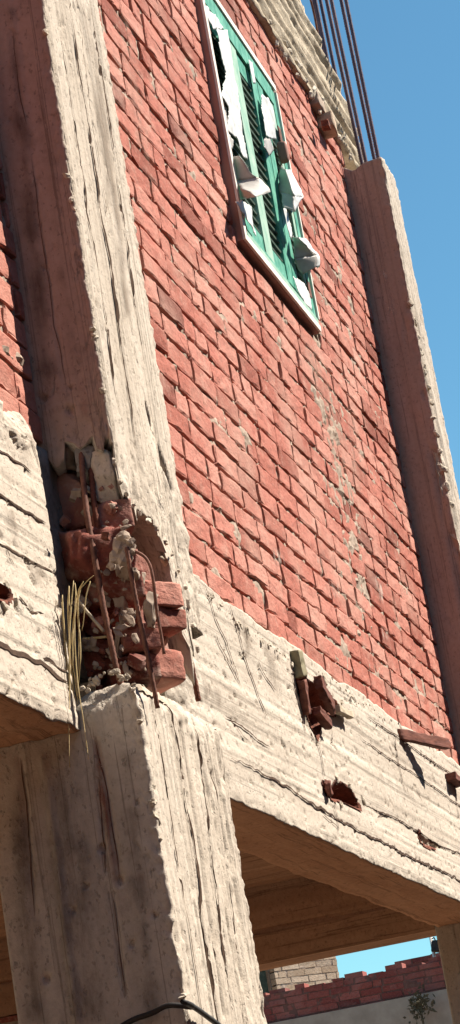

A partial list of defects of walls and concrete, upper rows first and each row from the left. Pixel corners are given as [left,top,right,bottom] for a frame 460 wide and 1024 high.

peeling [275,40,325,115]
spalling [312,0,380,165]
crack [63,2,151,436]
crack [0,441,39,471]
crack [0,493,45,523]
spalling [0,579,19,612]
crack [0,543,55,573]
spalling [57,452,201,724]
crack [0,641,67,682]
spalling [210,593,392,742]
crack [204,583,460,881]
spalling [321,776,366,812]